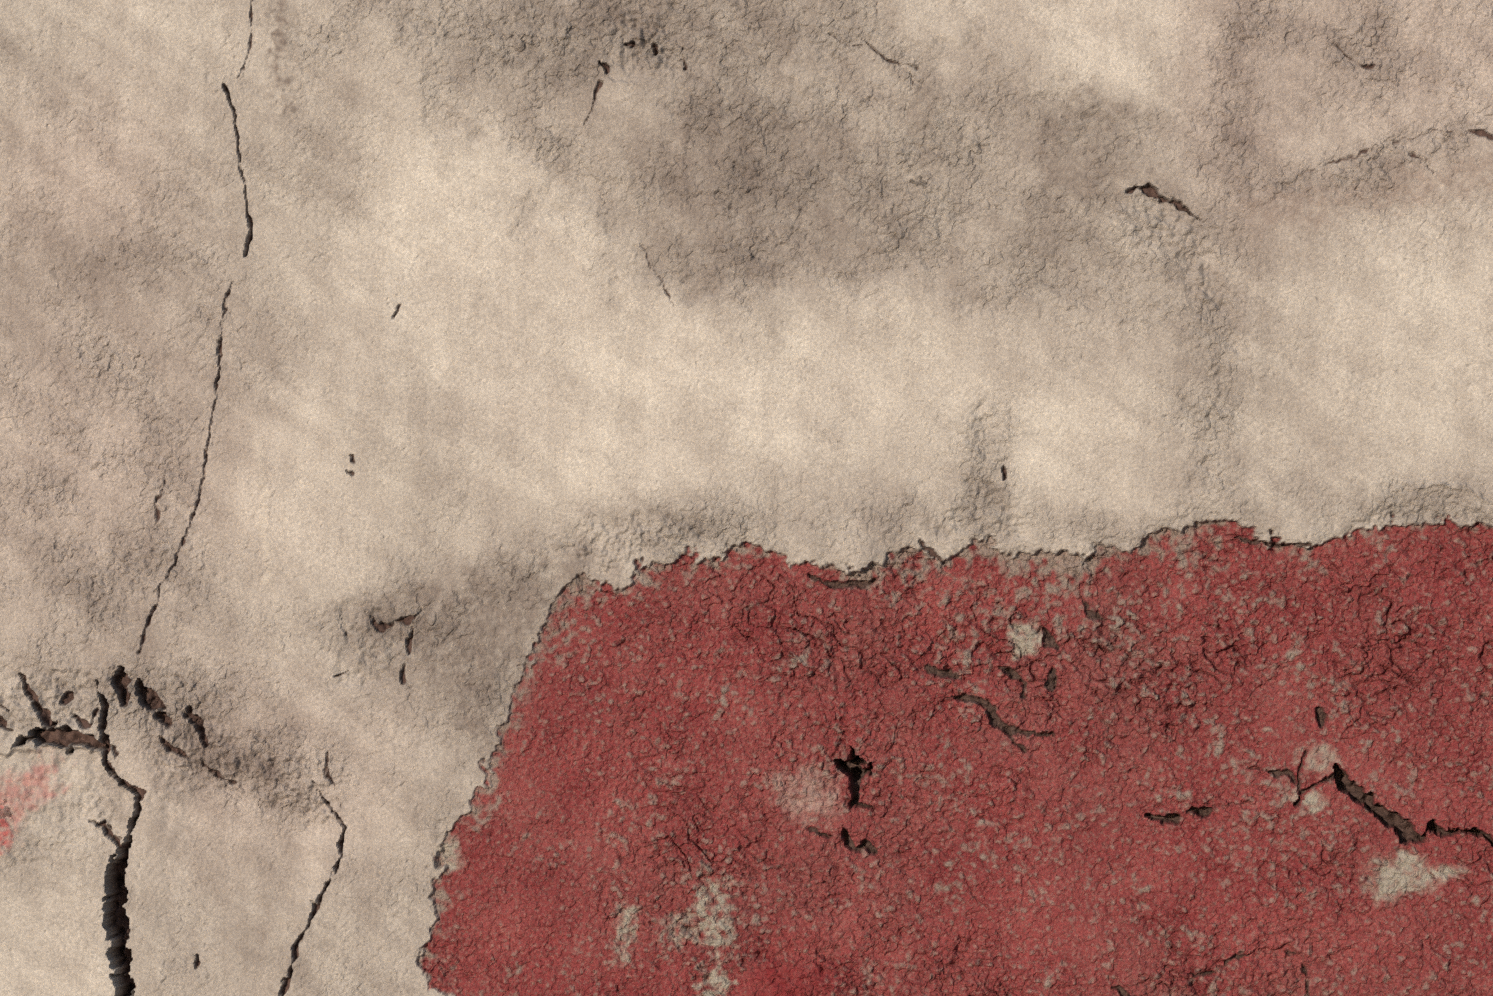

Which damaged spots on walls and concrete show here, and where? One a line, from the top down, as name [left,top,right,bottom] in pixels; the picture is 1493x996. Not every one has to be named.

crack [583,79,604,126]
crack [1250,127,1493,193]
crack [136,0,255,655]
spalling [556,505,774,587]
peeling [1003,615,1043,664]
crack [88,679,147,996]
crack [278,750,347,996]
peeling [761,759,855,840]
peeling [1288,739,1346,819]
crack [1246,748,1493,848]
peeling [1356,844,1472,913]
peeling [605,862,748,996]